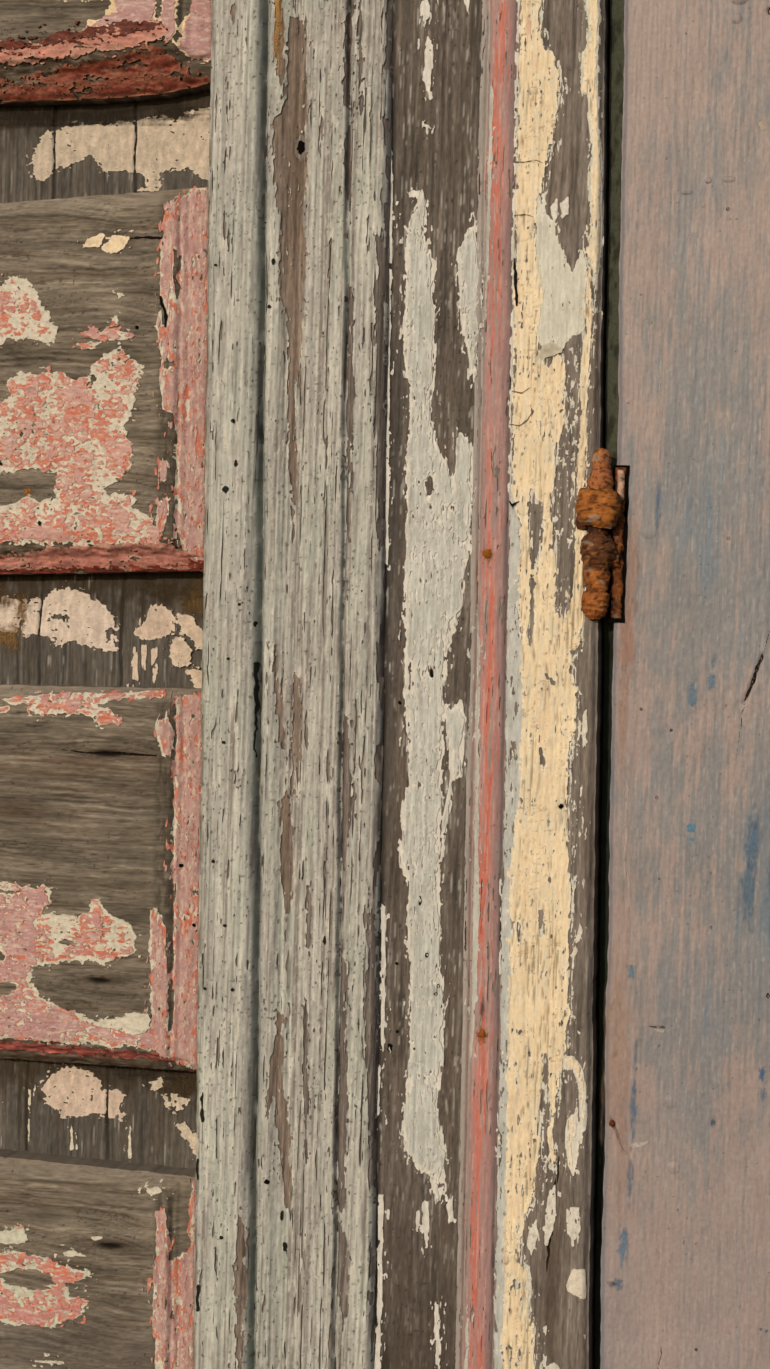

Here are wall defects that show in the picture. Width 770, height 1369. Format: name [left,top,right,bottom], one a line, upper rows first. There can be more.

peeling [0,0,212,103]
peeling [0,107,217,1162]
peeling [264,0,604,1369]
peeling [0,1223,98,1329]
peeling [31,1353,70,1369]
peeling [138,1179,196,1369]